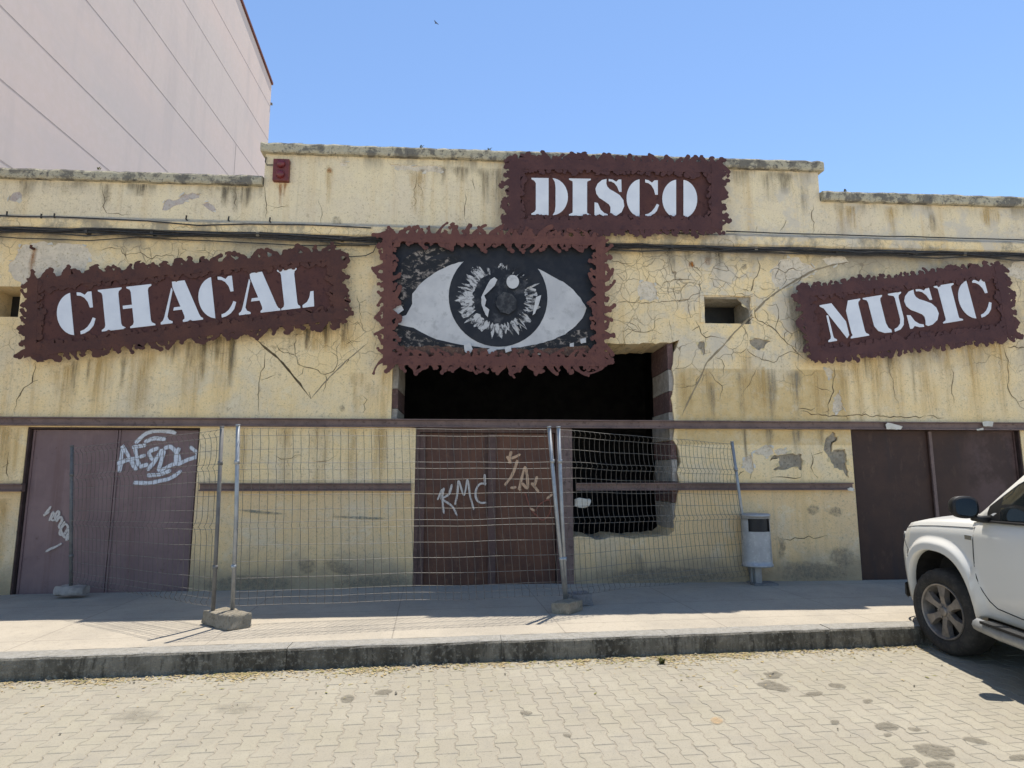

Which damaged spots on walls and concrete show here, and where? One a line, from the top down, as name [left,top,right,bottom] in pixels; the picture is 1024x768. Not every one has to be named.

peeling [162,192,216,212]
leakage [202,338,235,369]
crack [258,299,365,414]
crack [618,258,848,415]
crack [800,369,937,418]
flaking render [741,445,806,474]
flaking render [822,432,854,491]